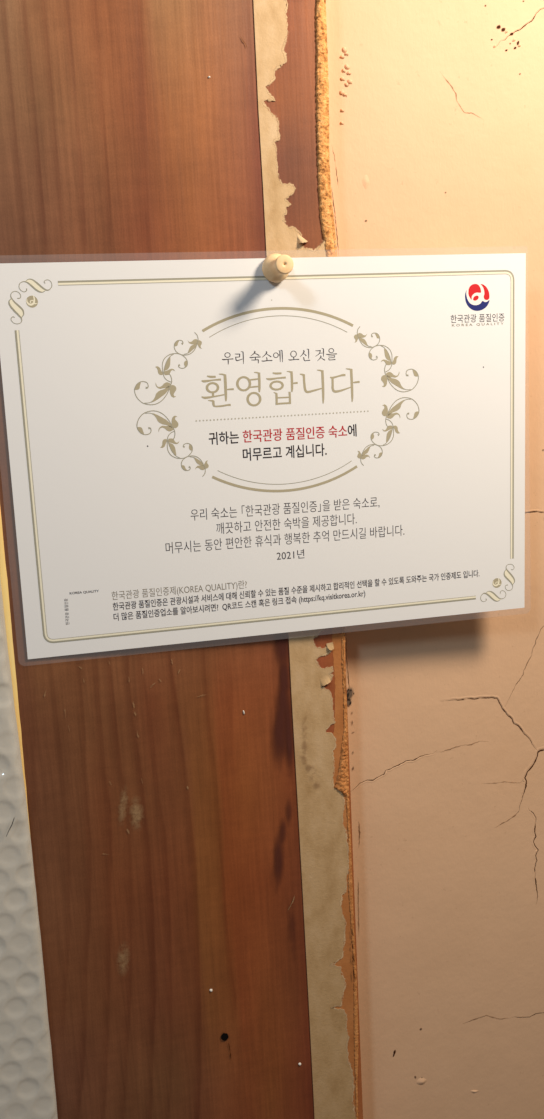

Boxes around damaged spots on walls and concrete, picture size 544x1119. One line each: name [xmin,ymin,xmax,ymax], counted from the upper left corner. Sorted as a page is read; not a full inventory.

crack [493,5,544,46]
crack [525,509,544,535]
crack [351,744,472,793]
crack [440,628,544,904]